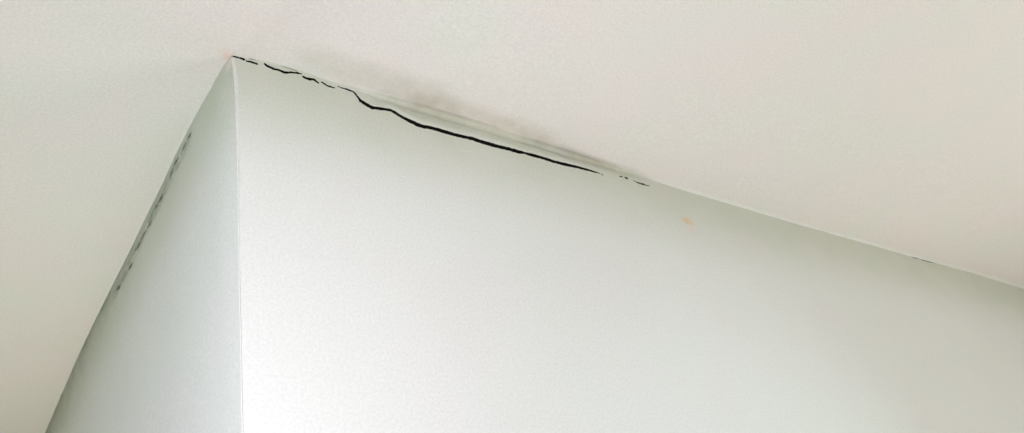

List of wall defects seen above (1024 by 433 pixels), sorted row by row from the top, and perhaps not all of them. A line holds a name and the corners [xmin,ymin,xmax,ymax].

crack [233,56,649,186]